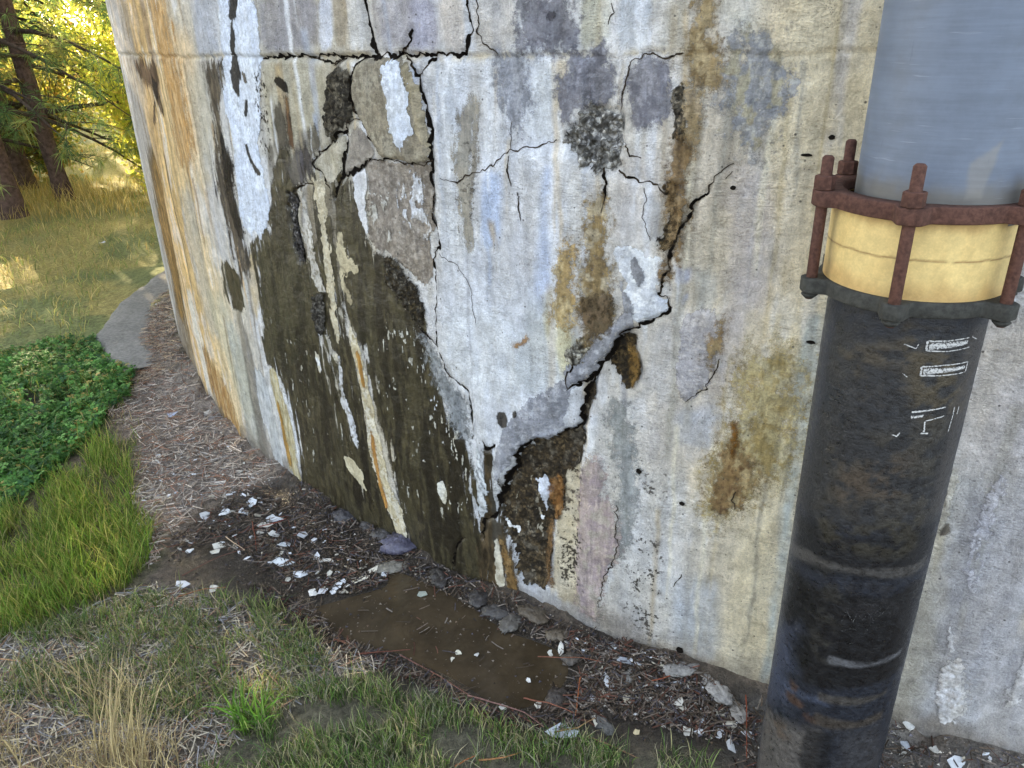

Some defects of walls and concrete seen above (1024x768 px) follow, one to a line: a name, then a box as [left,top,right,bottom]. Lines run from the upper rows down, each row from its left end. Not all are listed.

rust [147,0,197,174]
rust [274,76,294,148]
rust [657,0,728,284]
rust [151,153,185,323]
rust [202,348,241,436]
rust [255,367,302,481]
water stain [204,55,519,590]
spalling [285,58,683,622]
crack [263,0,734,566]
rust [695,318,818,532]
spalling [624,602,658,637]